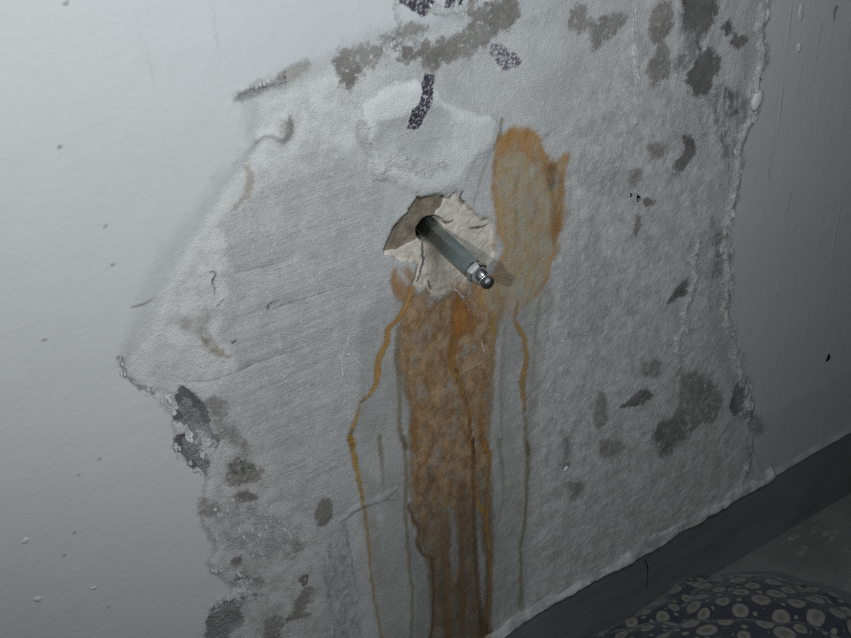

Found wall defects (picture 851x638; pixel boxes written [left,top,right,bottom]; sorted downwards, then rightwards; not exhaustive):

water stain [333,44,383,89]
water stain [392,0,520,70]
water stain [647,0,721,96]
water stain [723,21,748,49]
water stain [673,135,696,170]
peeling [117,0,771,638]
rust [361,128,569,638]
water stain [226,457,260,502]
rust [348,411,377,607]
water stain [264,587,313,638]